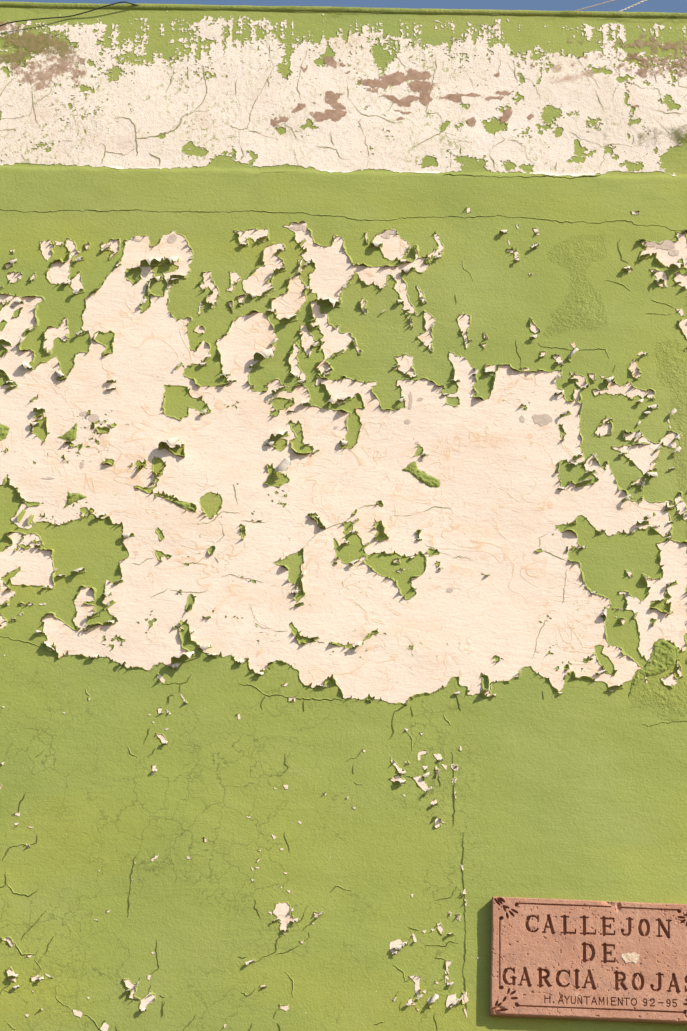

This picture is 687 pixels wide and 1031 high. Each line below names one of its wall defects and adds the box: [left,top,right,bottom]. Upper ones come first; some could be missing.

leakage [0,20,87,90]
crack [102,44,400,175]
peeling [0,11,687,177]
crack [393,52,687,179]
leakage [555,34,687,80]
crack [0,209,687,315]
peeling [0,220,687,706]
peeling [389,750,459,829]
crack [0,835,117,1030]
peeling [268,872,300,935]
peeling [391,960,469,1018]
crack [408,752,467,1017]